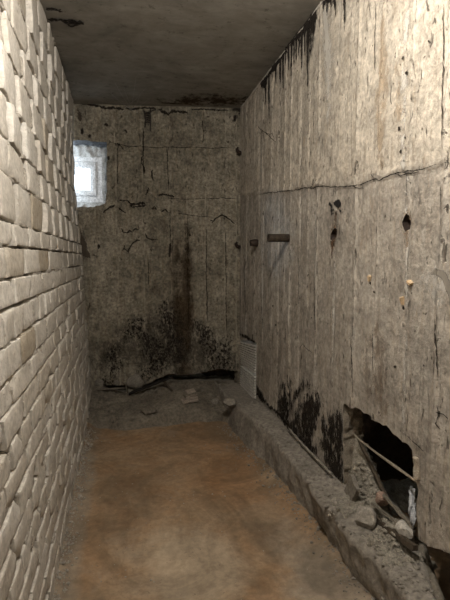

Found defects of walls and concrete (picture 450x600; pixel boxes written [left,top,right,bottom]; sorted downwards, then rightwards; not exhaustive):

damp [260,0,346,122]
crack [264,5,446,194]
crack [82,104,238,329]
spalling [402,214,411,232]
damp [124,298,184,380]
spalling [277,380,438,570]